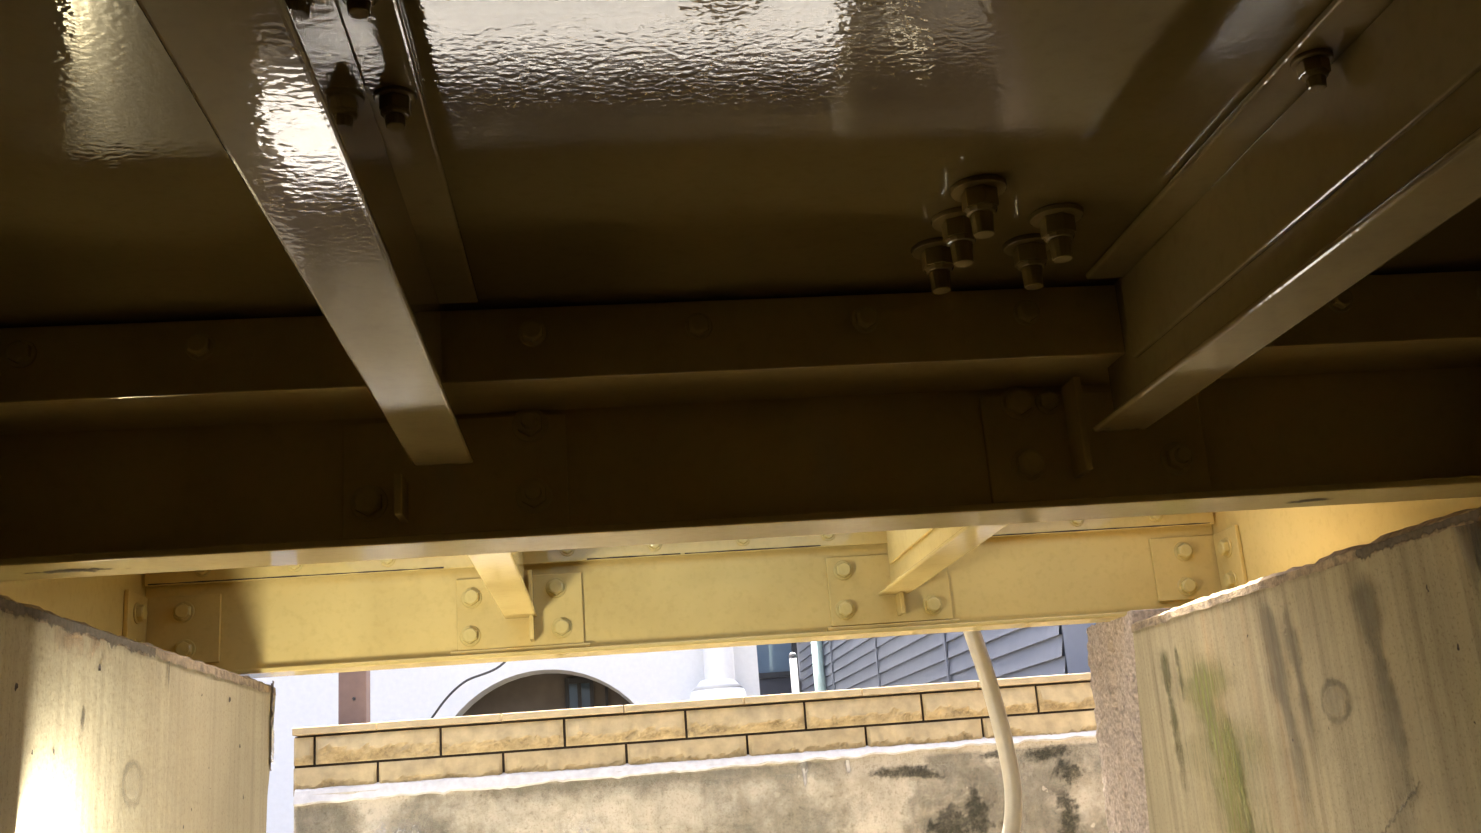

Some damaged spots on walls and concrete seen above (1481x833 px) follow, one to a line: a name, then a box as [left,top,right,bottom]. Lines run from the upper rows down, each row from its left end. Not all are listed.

water stain [870,744,1109,833]